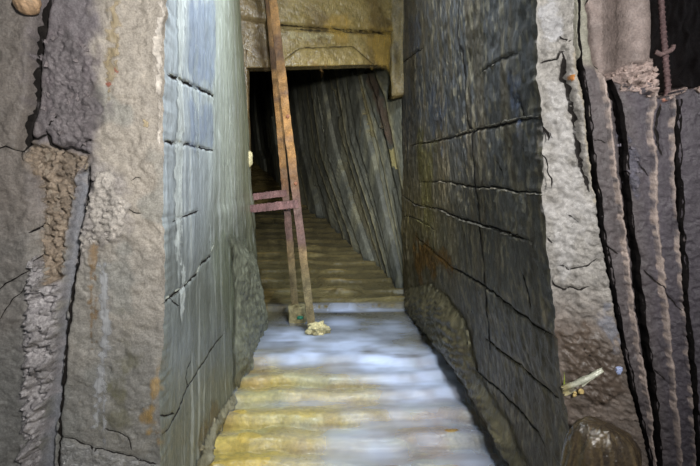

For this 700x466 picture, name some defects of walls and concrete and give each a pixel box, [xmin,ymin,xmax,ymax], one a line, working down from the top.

spalling [603,59,700,100]
crack [0,253,45,319]
spalling [15,31,104,466]
leakage [93,263,111,429]
crack [57,233,156,466]
crack [160,336,222,434]
crack [402,5,560,400]
crack [476,369,548,451]
crack [541,0,700,466]